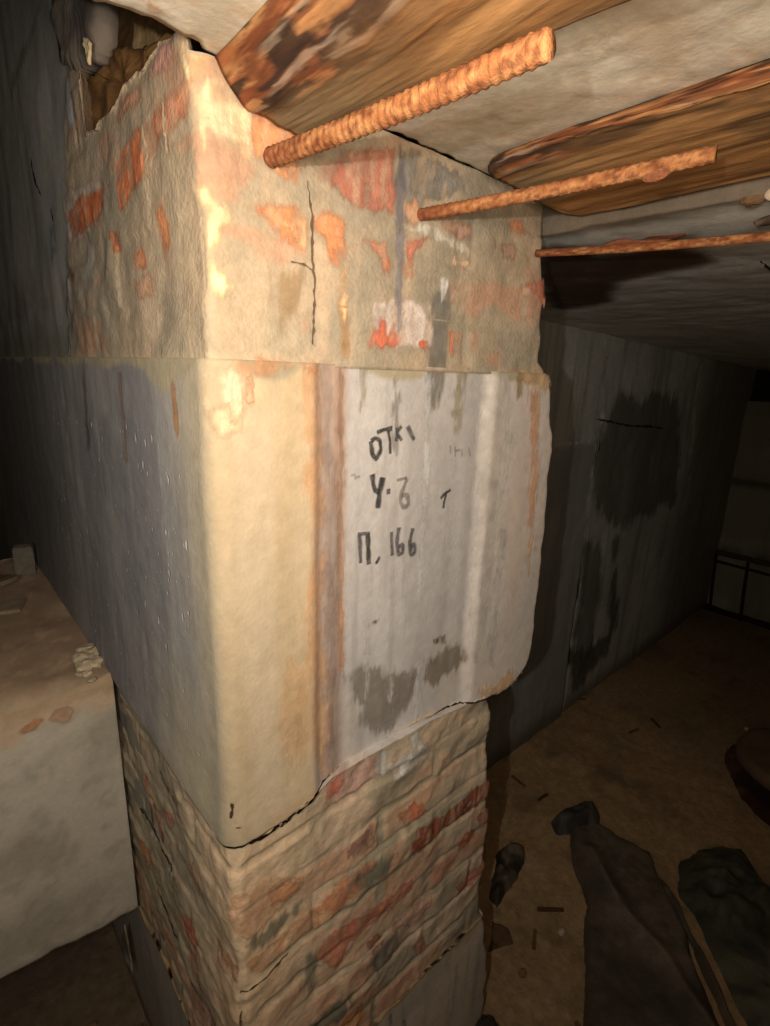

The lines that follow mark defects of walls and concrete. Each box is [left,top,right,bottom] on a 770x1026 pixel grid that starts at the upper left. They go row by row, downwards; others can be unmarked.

spalling [63,26,718,248]
flaking render [210,266,227,295]
peeling [257,204,349,321]
crack [291,180,316,345]
peeling [371,242,390,271]
water stain [395,149,471,331]
spalling [535,231,770,257]
water stain [353,374,522,732]
crack [426,695,497,719]
water stain [376,732,428,780]
crack [223,766,339,849]